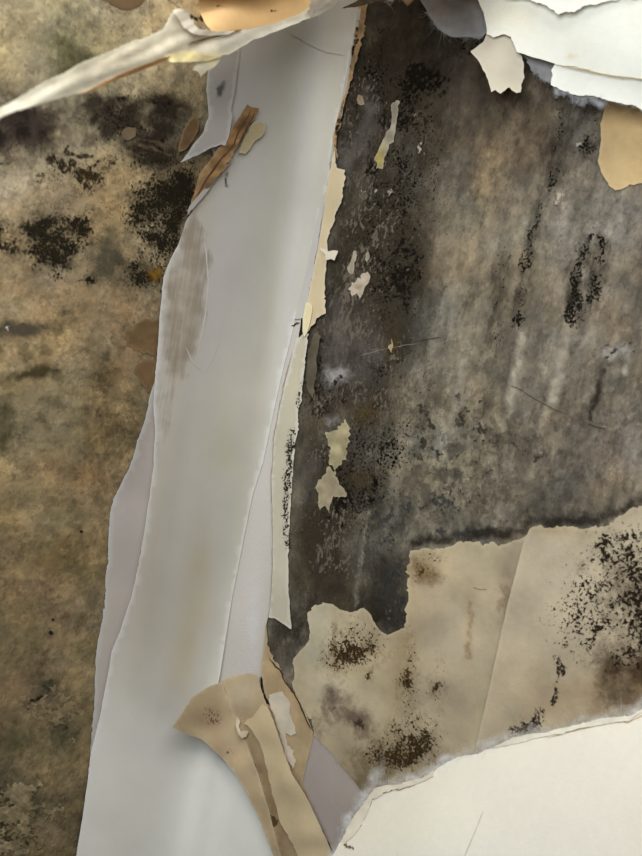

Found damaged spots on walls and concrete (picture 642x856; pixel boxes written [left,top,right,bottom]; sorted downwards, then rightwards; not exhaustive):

peeling [105,0,153,14]
peeling [122,127,136,140]
leakage [0,84,200,296]
leakage [280,0,475,679]
leakage [493,195,542,406]
leakage [561,226,609,329]
leakage [589,342,635,419]
leakage [463,527,521,540]
leakage [531,498,642,691]
leakage [326,688,368,730]
leakage [363,626,442,773]
leakage [510,655,566,736]